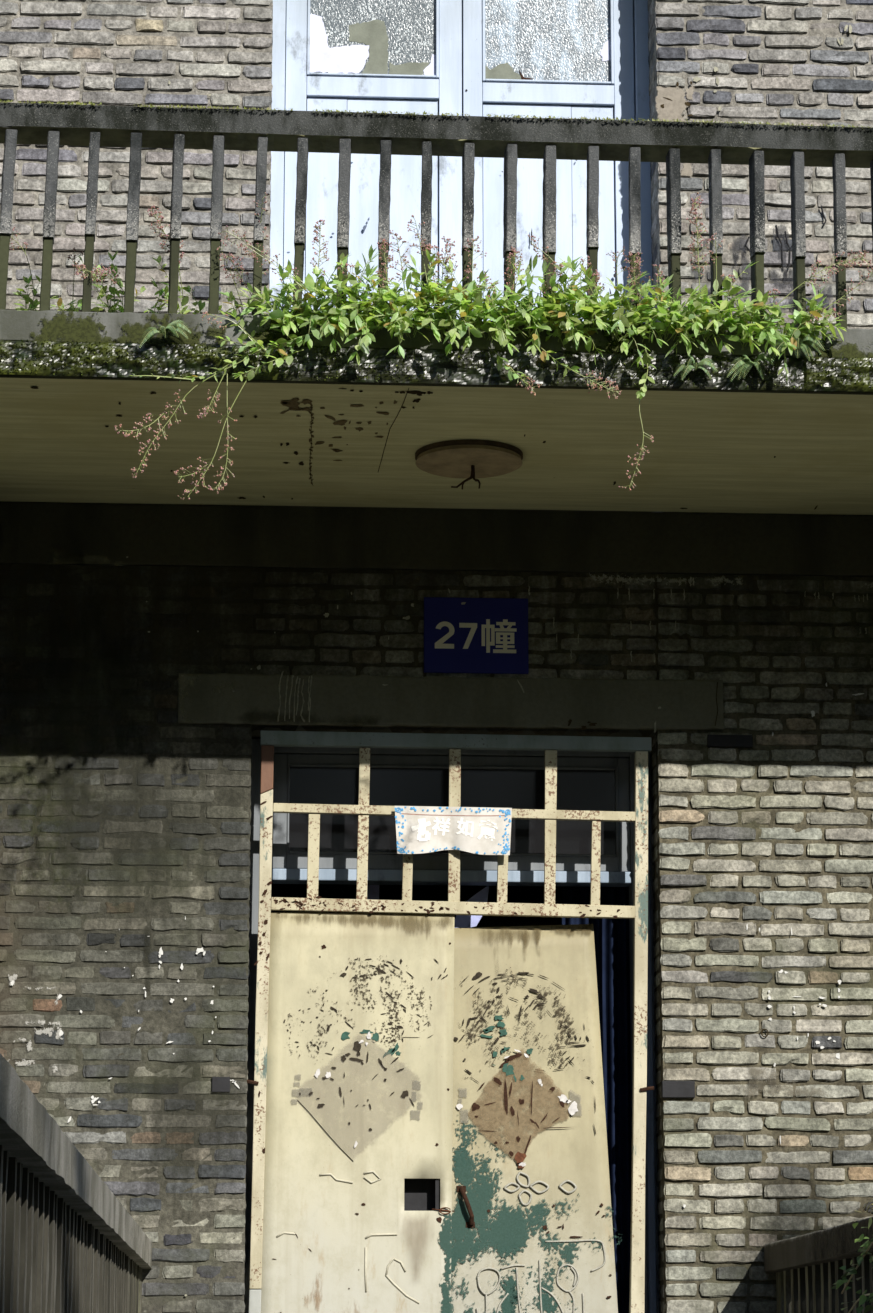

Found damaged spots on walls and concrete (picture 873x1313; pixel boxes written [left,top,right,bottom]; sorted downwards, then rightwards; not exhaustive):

peeling [284,956,594,1109]
peeling [438,1120,622,1313]